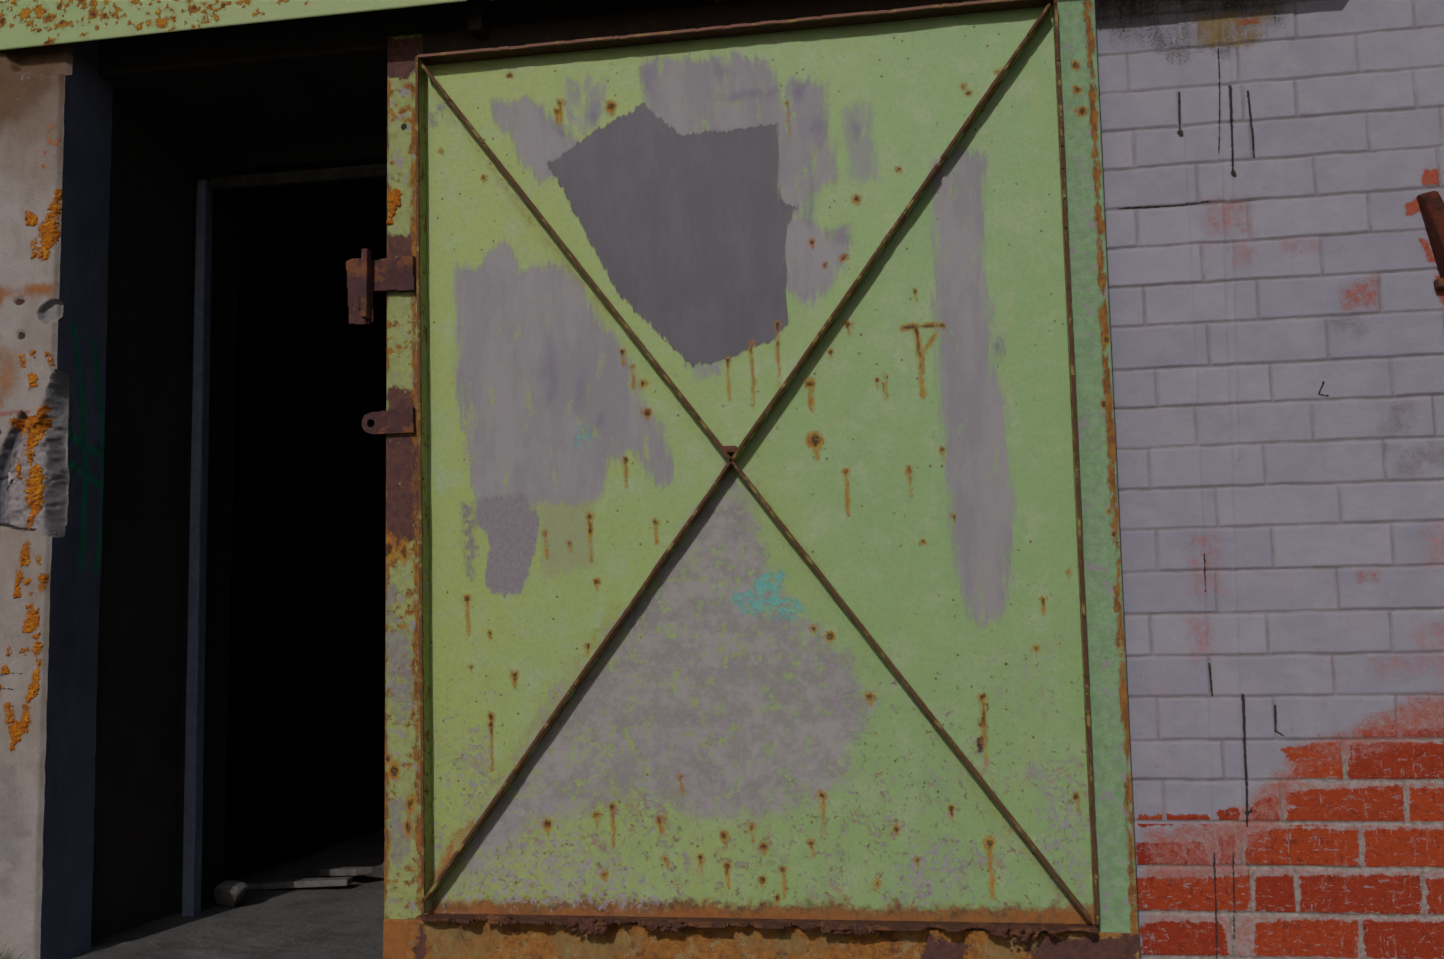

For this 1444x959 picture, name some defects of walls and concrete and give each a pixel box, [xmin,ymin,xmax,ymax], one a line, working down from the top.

rust [387,78,417,258]
rust [435,91,616,321]
spalling [0,369,70,537]
rust [384,292,1095,944]
peeling [1135,686,1444,959]